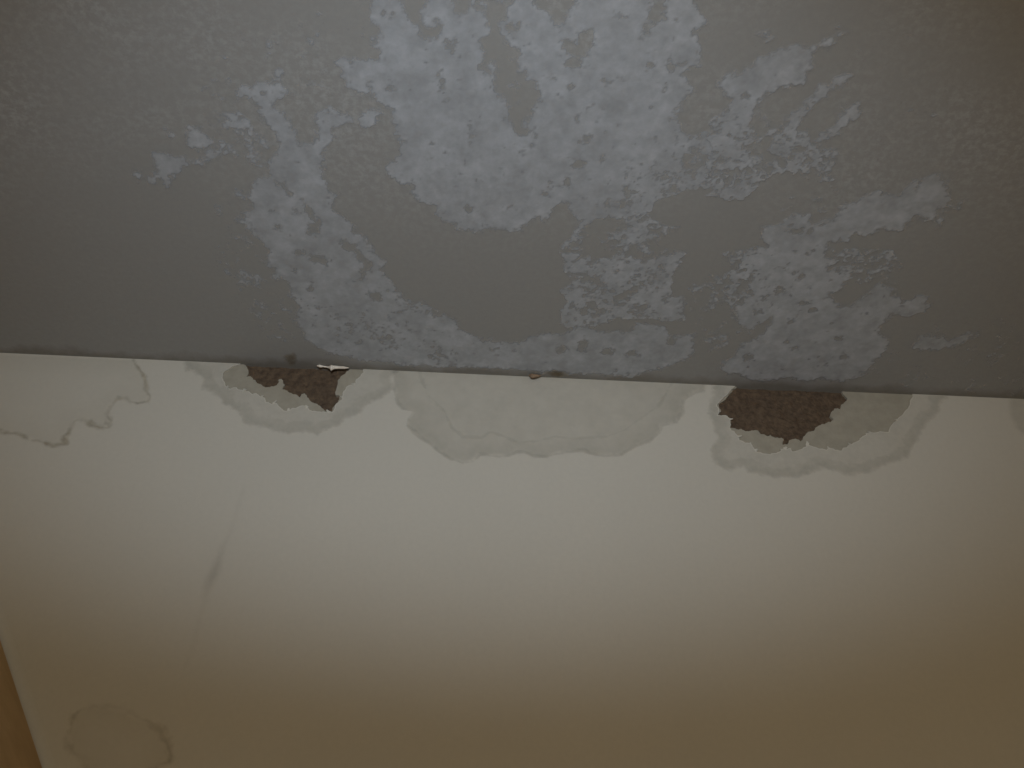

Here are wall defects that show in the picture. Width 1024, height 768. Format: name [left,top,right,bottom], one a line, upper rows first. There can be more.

water stain [133,0,962,382]
spalling [222,363,364,413]
spalling [716,386,914,455]